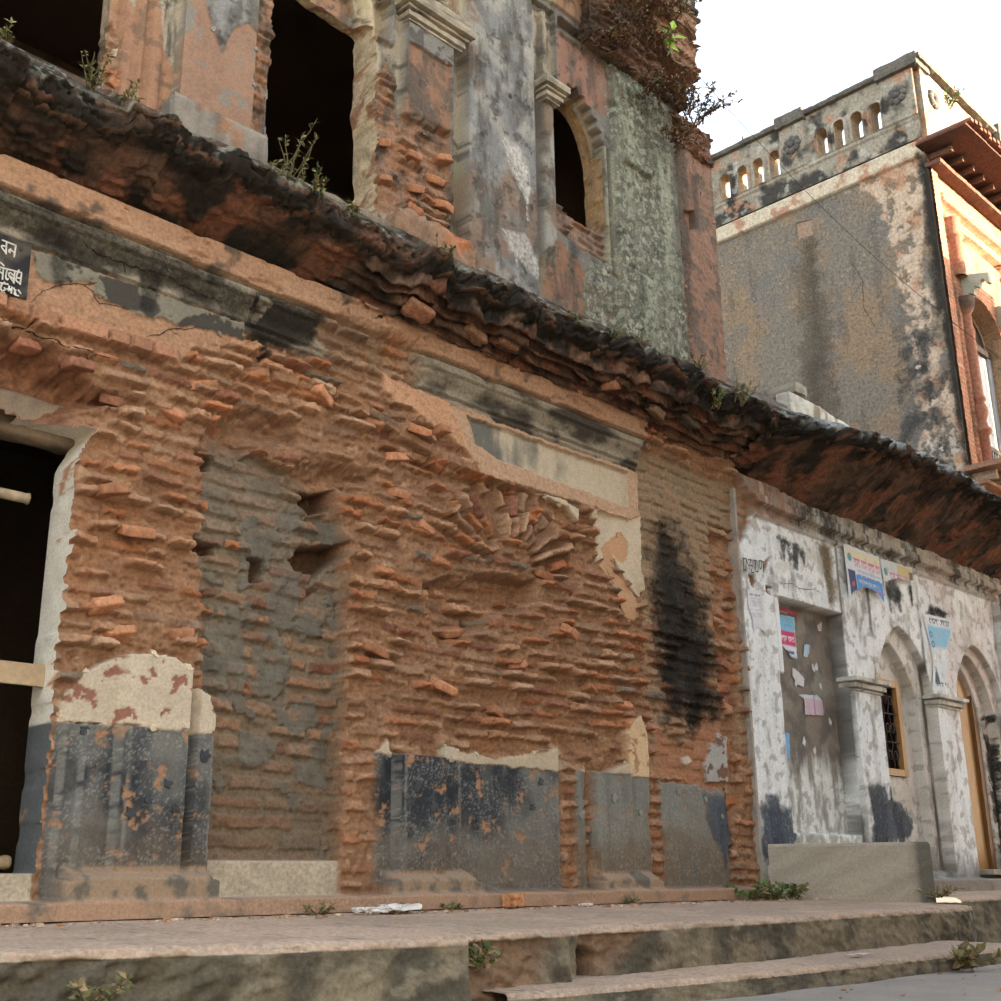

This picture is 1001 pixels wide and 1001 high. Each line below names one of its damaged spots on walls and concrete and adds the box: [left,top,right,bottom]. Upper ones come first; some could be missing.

peeling [101,0,275,134]
peeling [410,23,454,66]
spalling [372,60,454,231]
damp [0,190,322,363]
damp [896,153,970,476]
spalling [0,252,753,922]
damp [776,535,805,570]
damp [886,580,913,612]
damp [926,604,947,618]
damp [759,794,797,865]
damp [869,784,913,842]
damp [980,715,1001,852]